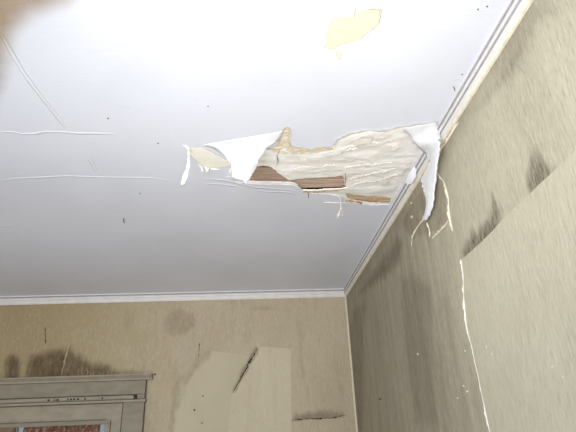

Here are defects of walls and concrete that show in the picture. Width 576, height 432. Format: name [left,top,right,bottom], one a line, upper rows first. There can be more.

spalling [181,121,441,222]
water stain [32,353,118,377]